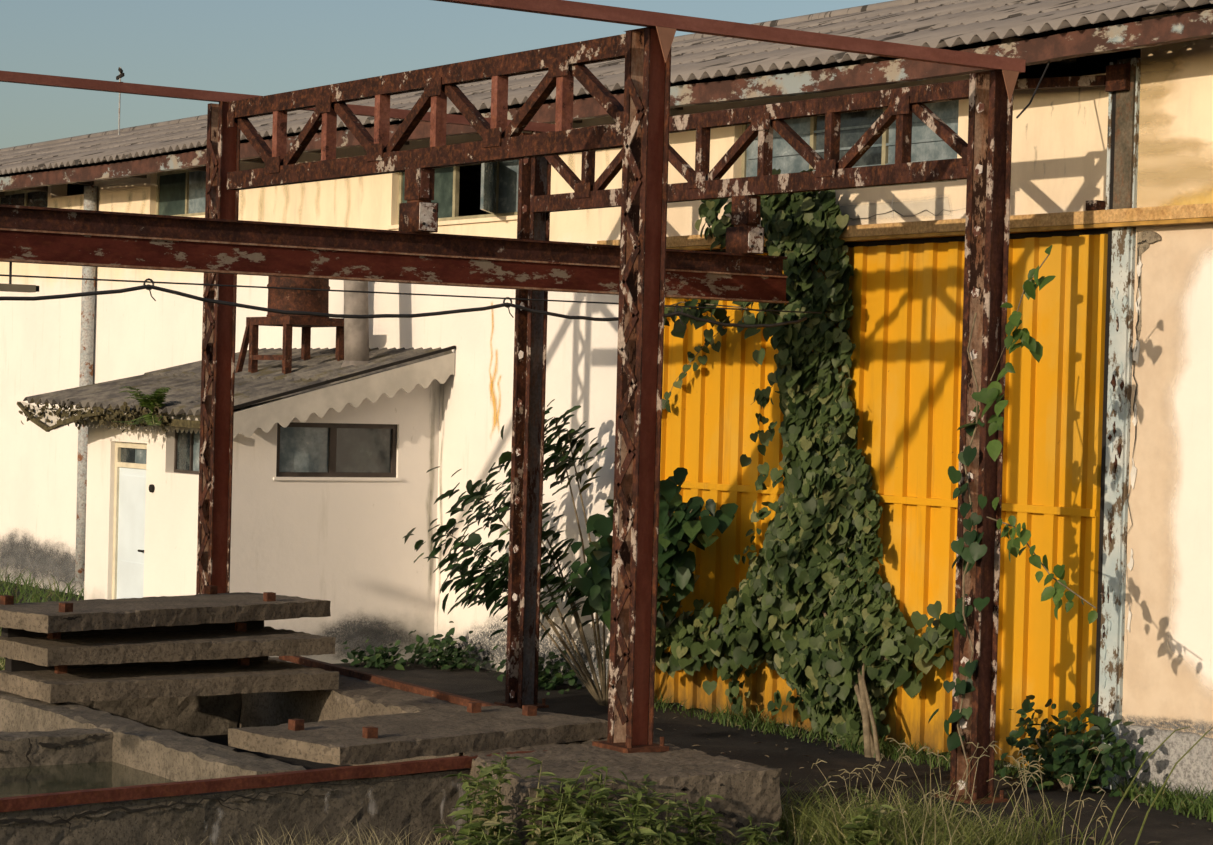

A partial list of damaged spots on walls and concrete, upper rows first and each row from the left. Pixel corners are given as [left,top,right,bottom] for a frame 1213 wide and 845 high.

corrosion [490,353,499,425]
flaking render [1101,223,1213,738]
water stain [0,533,83,583]